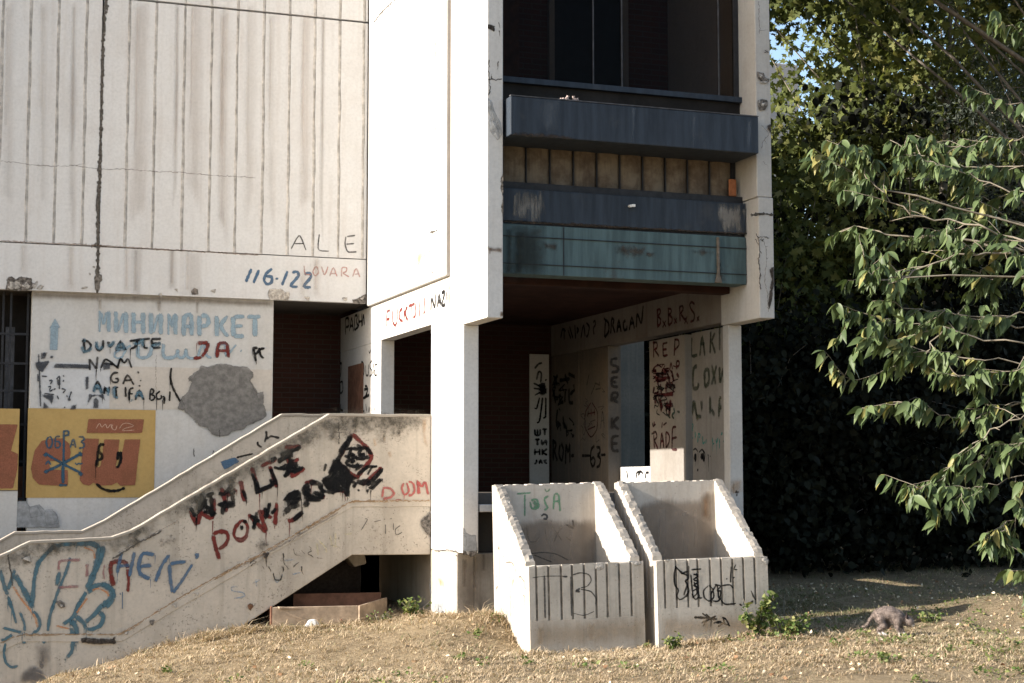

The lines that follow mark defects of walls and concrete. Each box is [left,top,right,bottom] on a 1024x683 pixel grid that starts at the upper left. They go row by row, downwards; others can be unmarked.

crack [91,0,109,274]
spalling [5,276,44,291]
peeling [501,175,541,219]
peeling [718,206,745,231]
crack [751,212,774,289]
peeling [178,364,266,436]